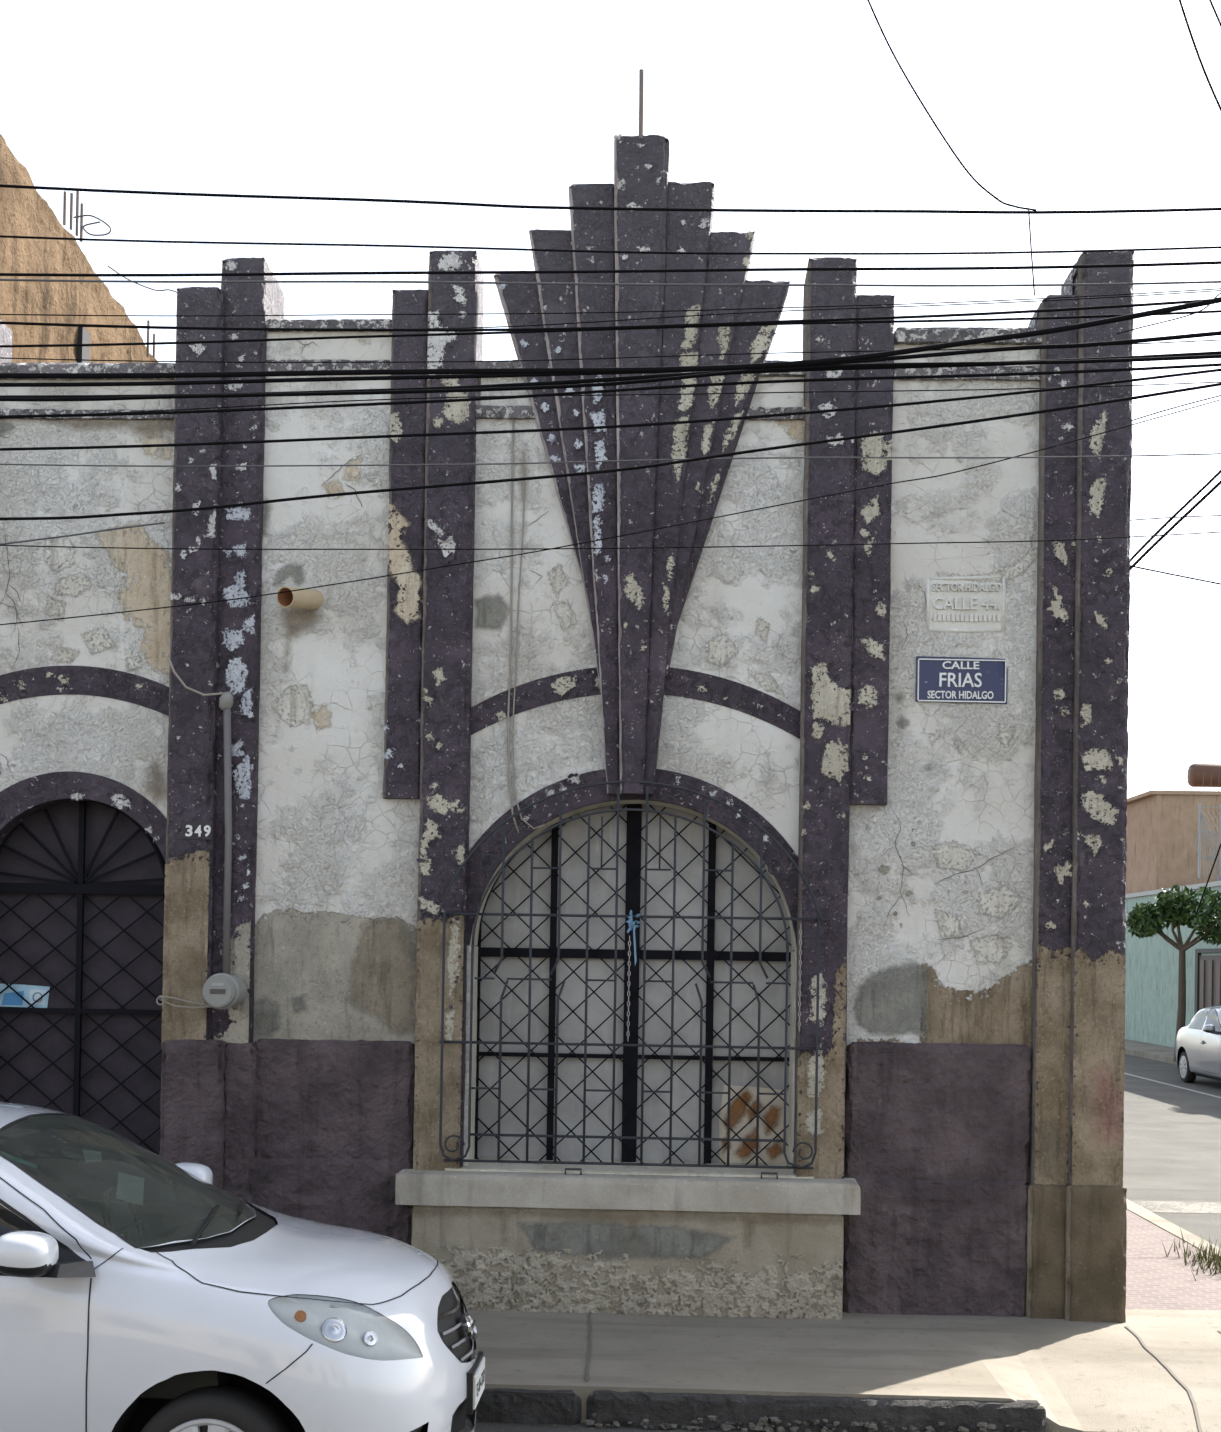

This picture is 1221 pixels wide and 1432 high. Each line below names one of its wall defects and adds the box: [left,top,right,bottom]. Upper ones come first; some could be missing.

peeling [670,303,777,506]
peeling [818,401,892,477]
crack [0,535,23,667]
flaking render [43,500,256,718]
flaking render [387,504,461,624]
peeling [809,657,878,783]
peeling [416,782,466,876]
peeling [1043,748,1124,884]
leakage [253,998,304,1035]
leakage [350,920,415,1032]
flaking render [796,909,1126,1187]
corrosion [723,1092,783,1159]